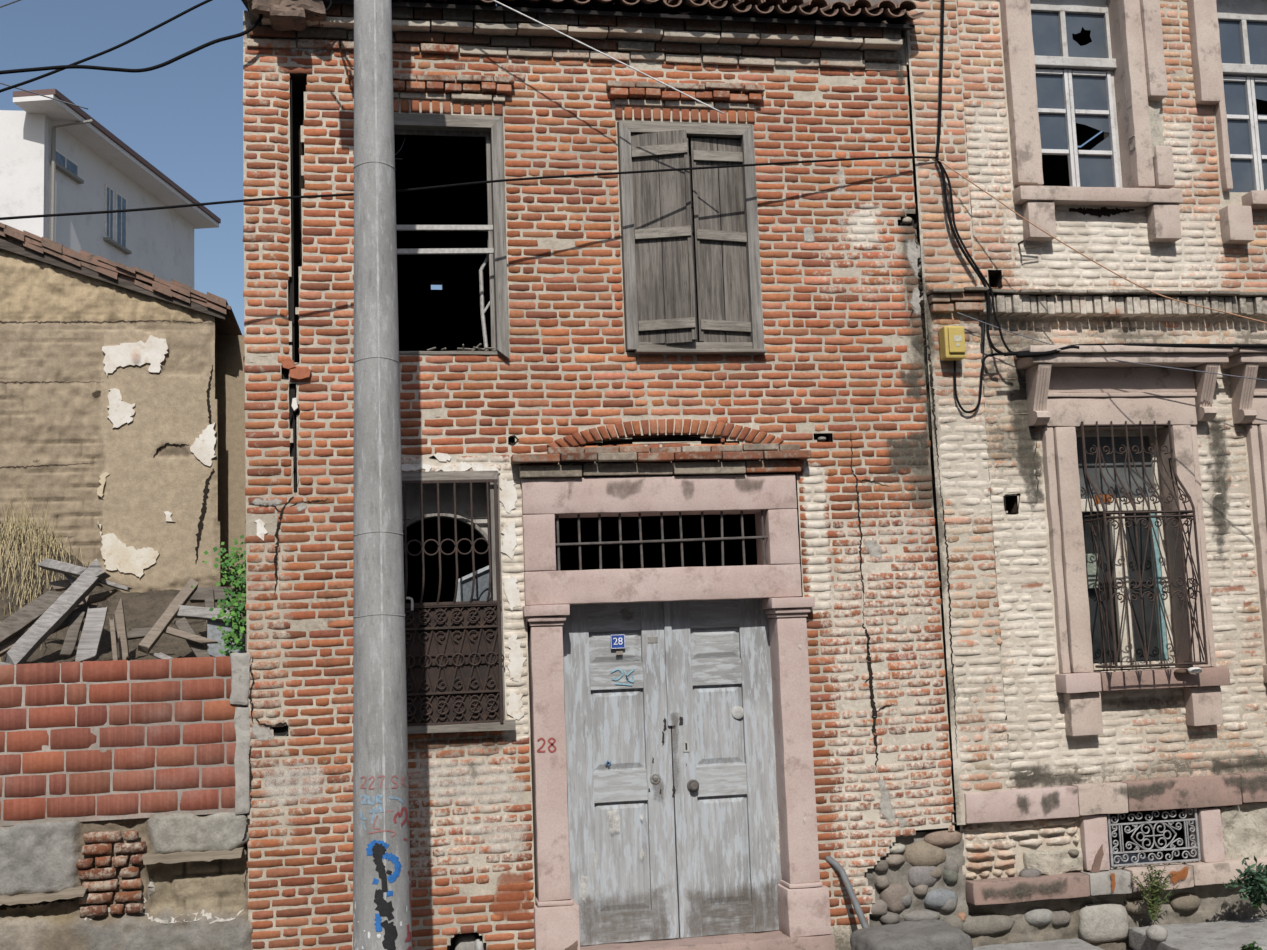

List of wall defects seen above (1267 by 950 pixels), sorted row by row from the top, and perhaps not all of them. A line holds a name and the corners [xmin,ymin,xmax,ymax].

crack [251,73,330,595]
peeling [98,520,160,579]
peeling [102,335,169,429]
peeling [153,423,217,466]
crack [195,469,215,563]
crack [205,365,213,424]
leakage [1007,371,1044,507]
leakage [1208,418,1230,555]
crack [850,433,894,773]
leakage [1013,766,1080,812]
leakage [1120,781,1175,799]
leakage [1213,756,1267,794]